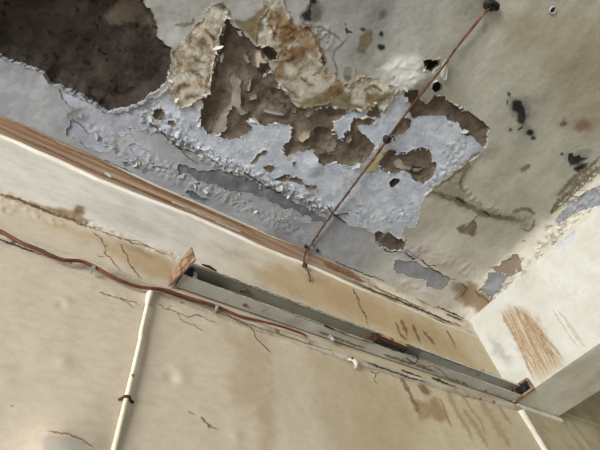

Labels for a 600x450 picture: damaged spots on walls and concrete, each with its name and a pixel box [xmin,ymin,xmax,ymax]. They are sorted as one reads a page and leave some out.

peeling [0,0,499,290]
water stain [507,93,535,139]
crack [51,212,159,277]
crack [159,304,214,330]
water stain [504,308,560,372]